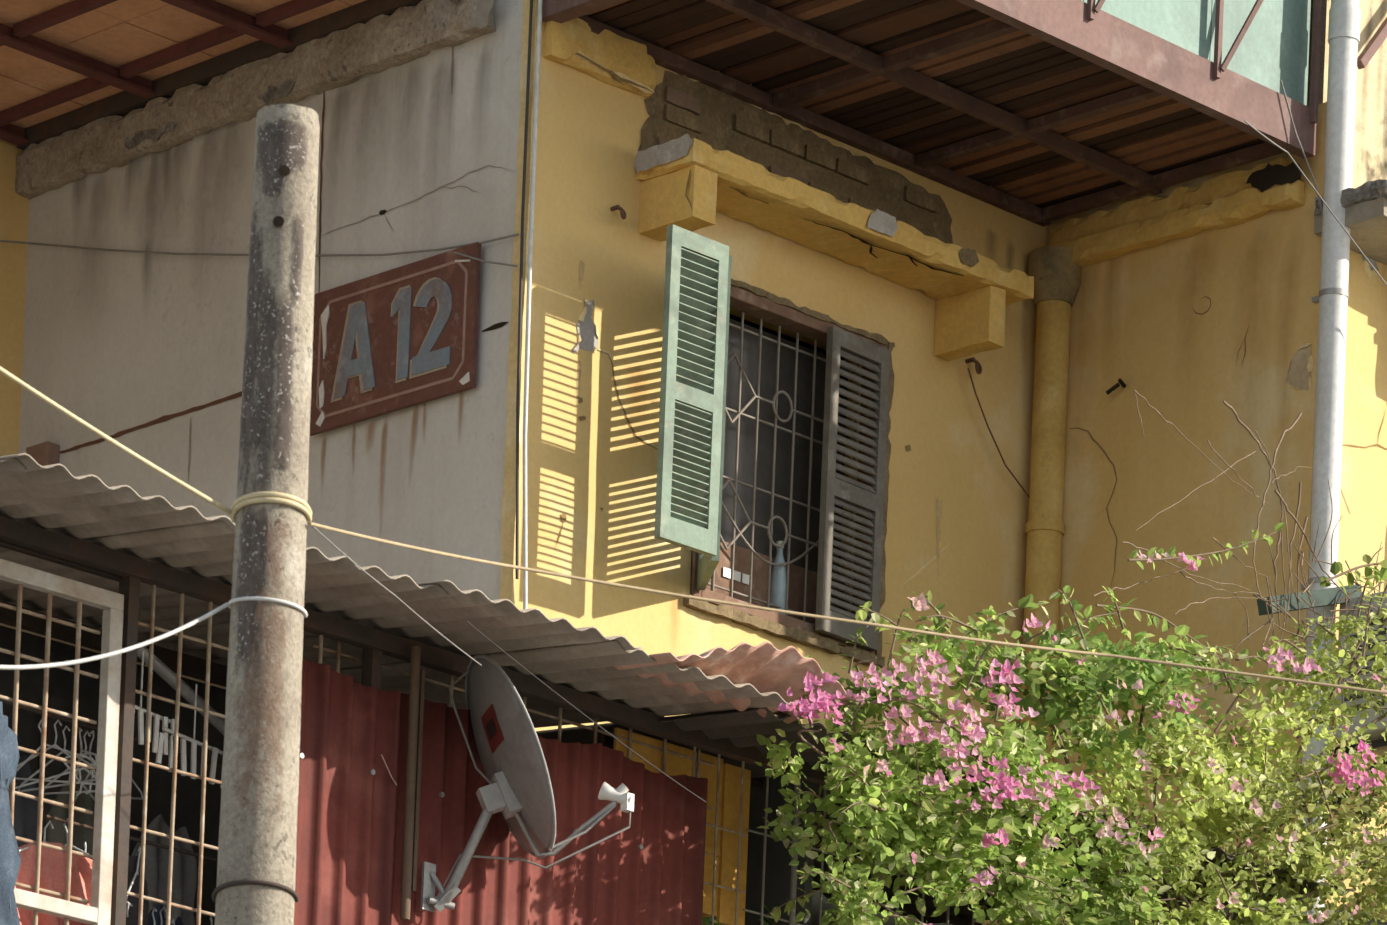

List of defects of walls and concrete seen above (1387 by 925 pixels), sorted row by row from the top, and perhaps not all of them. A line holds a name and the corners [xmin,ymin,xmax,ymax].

crack [318,92,515,289]
spalling [571,298,599,353]
spalling [634,70,980,267]
crack [804,219,964,276]
crack [1070,427,1117,585]